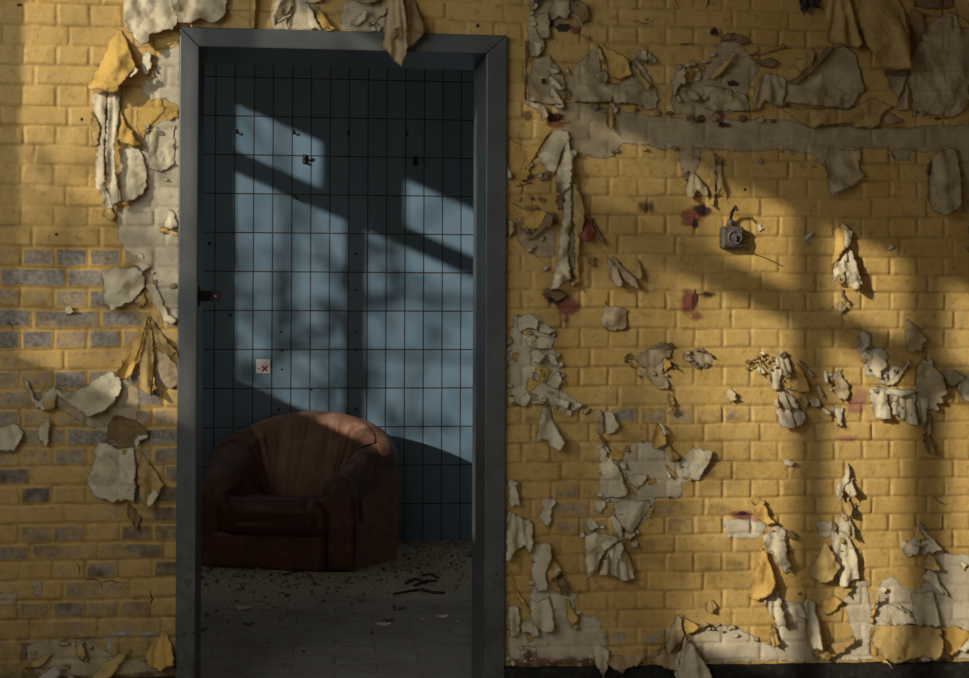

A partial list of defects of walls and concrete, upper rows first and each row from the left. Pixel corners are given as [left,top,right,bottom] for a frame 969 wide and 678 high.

peeling [270,0,425,66]
peeling [506,0,969,313]
peeling [0,423,24,452]
peeling [23,0,228,529]
peeling [506,313,583,452]
peeling [600,302,628,332]
peeling [579,409,713,582]
peeling [624,342,715,390]
peeling [745,350,850,429]
peeling [857,319,969,455]
peeling [505,463,969,678]